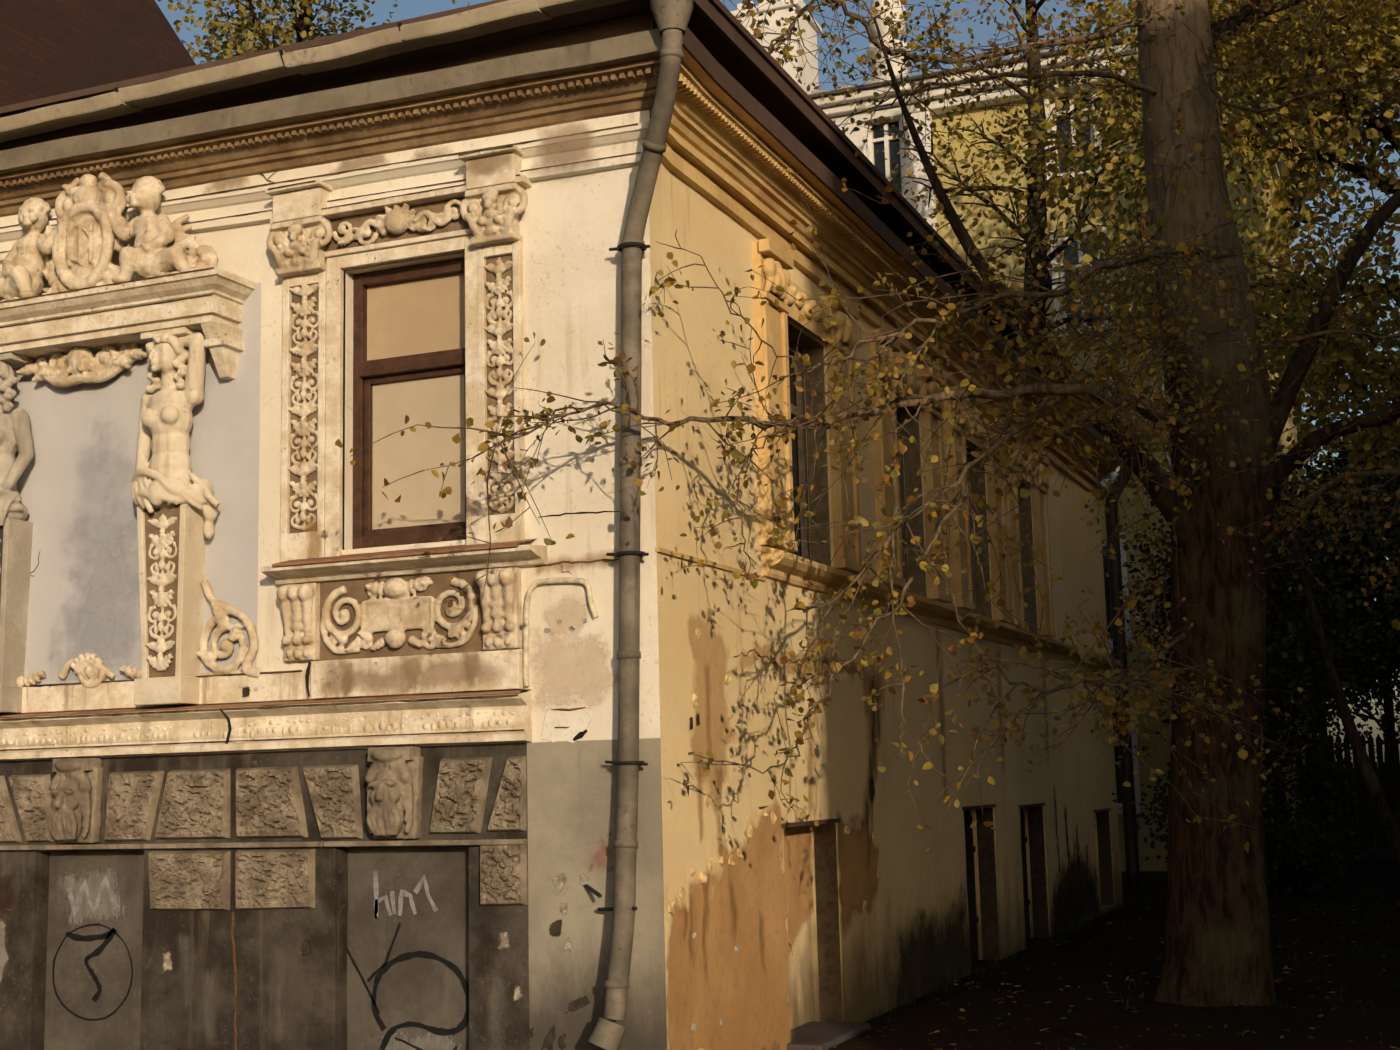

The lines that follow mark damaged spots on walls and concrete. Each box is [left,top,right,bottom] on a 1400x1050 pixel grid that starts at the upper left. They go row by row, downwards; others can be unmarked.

peeling [666,807,814,1050]
leakage [896,890,971,1008]